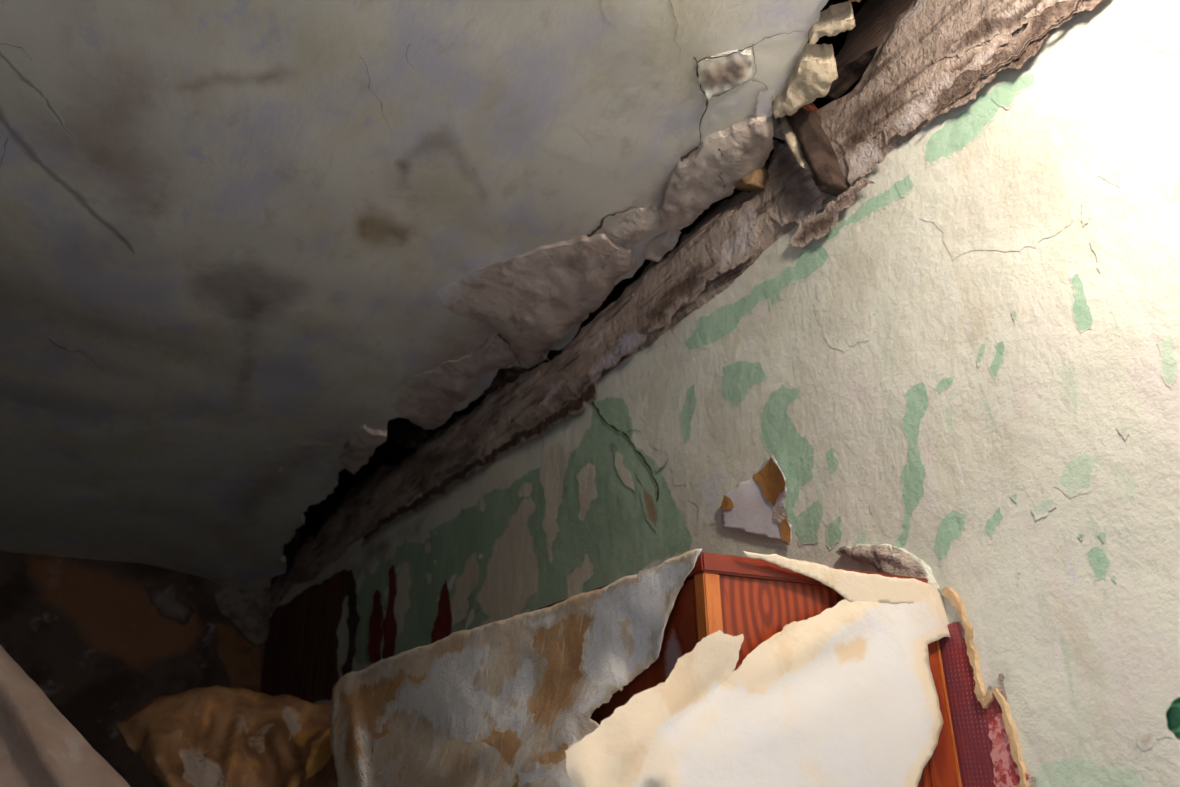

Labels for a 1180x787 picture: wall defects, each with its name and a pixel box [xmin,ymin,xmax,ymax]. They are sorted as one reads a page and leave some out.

crack [0,43,78,144]
crack [0,103,135,254]
water stain [0,23,327,421]
water stain [339,113,497,262]
water stain [453,105,757,286]
crack [667,0,802,191]
peeling [678,65,1041,353]
water stain [208,306,500,549]
crack [363,331,668,540]
peeling [347,386,695,671]
peeling [720,359,843,550]
spalling [939,587,1037,787]